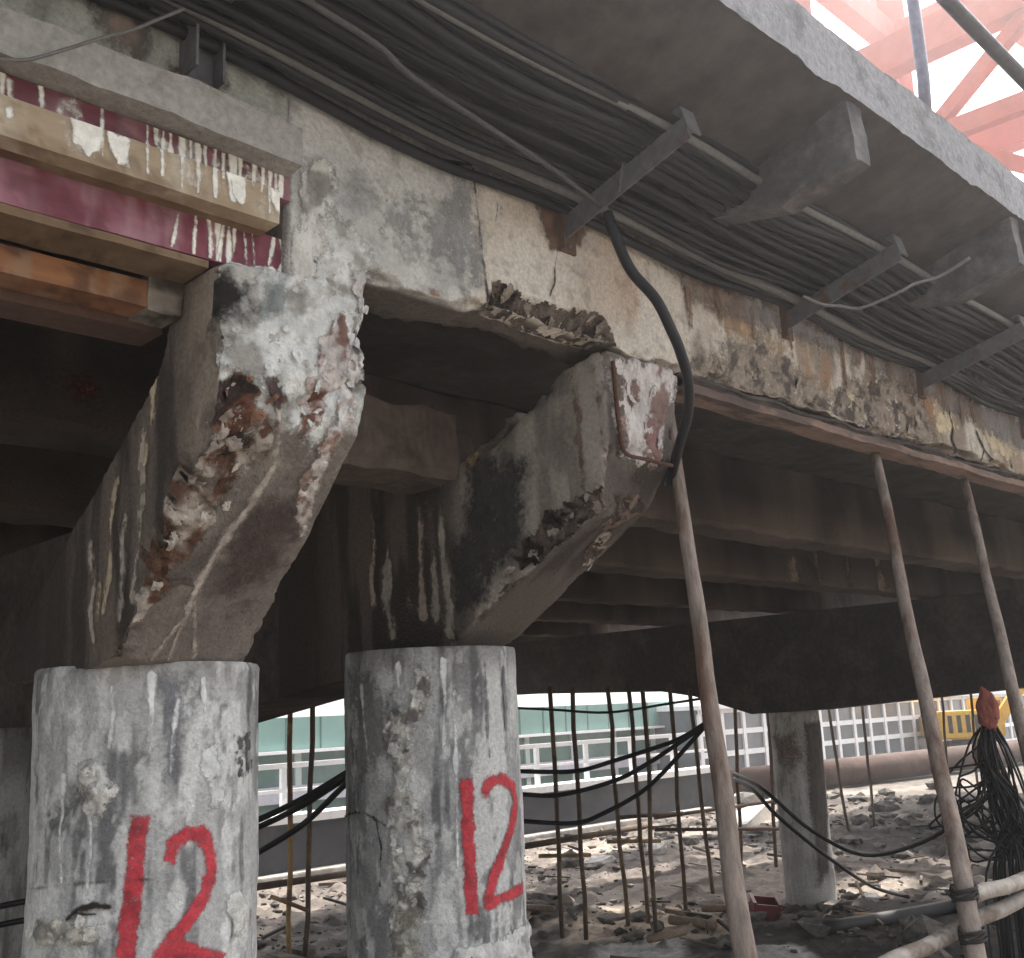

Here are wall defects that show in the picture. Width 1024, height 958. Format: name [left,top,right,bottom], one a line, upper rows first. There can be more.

crack [472,168,498,299]
peeling [132,157,379,623]
corrosion [318,312,356,392]
peeling [479,280,677,471]
corrosion [596,368,640,462]
corrosion [644,408,662,460]
crack [948,412,1013,469]
water stain [87,377,158,645]
water stain [407,507,455,640]
water stain [147,671,208,772]
crack [344,810,386,887]
peeling [382,668,432,958]